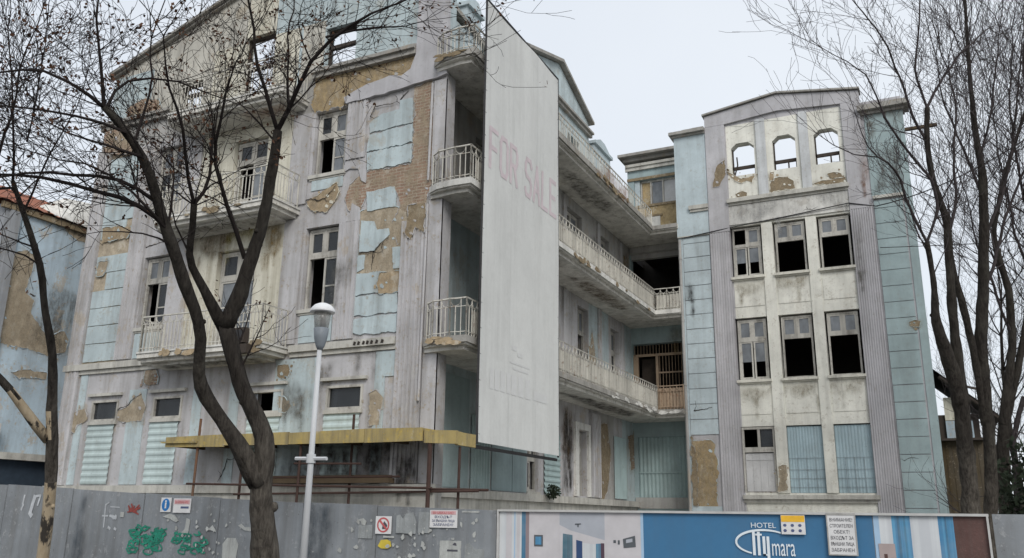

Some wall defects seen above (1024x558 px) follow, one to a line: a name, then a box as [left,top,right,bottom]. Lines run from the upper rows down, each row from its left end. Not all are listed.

flaking render [311,56,415,112]
flaking render [307,81,434,295]
flaking render [713,160,795,197]
flaking render [813,168,847,185]
flaking render [0,249,69,360]
flaking render [116,369,159,423]
flaking render [362,389,383,428]
flaking render [600,423,611,499]
flaking render [689,436,719,506]
flaking render [774,464,789,493]